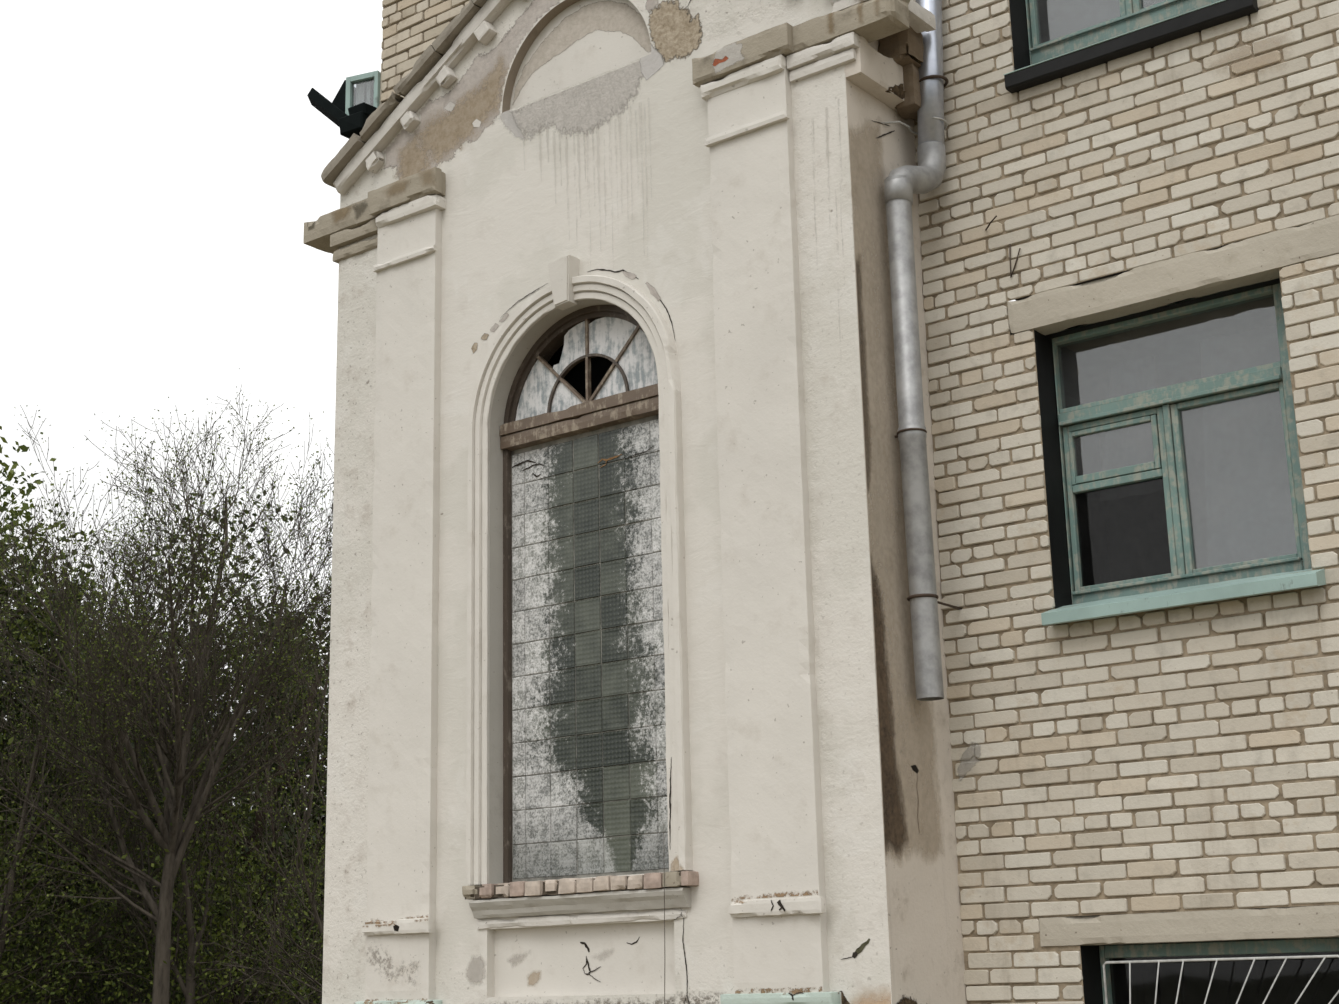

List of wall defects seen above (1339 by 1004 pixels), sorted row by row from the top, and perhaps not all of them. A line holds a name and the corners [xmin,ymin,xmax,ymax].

flaking render [372,0,703,180]
leakage [850,129,938,854]
crack [674,908,689,1004]